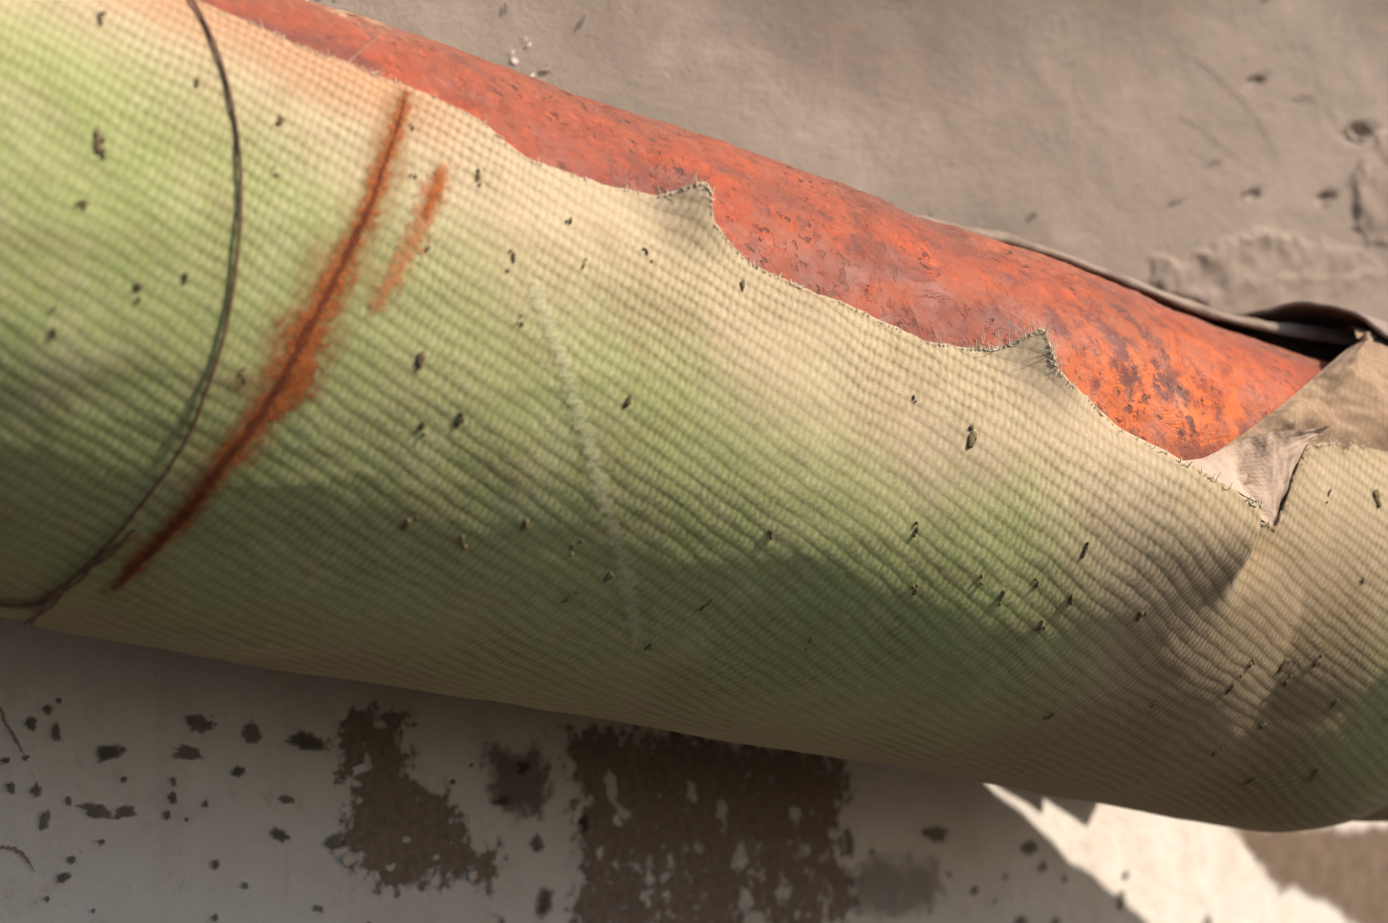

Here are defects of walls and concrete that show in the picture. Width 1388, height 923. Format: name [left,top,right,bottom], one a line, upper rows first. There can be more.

corrosion [370,164,451,313]
spalling [1239,186,1265,204]
corrosion [104,88,412,594]
peeling [320,701,509,898]
peeling [556,724,861,923]